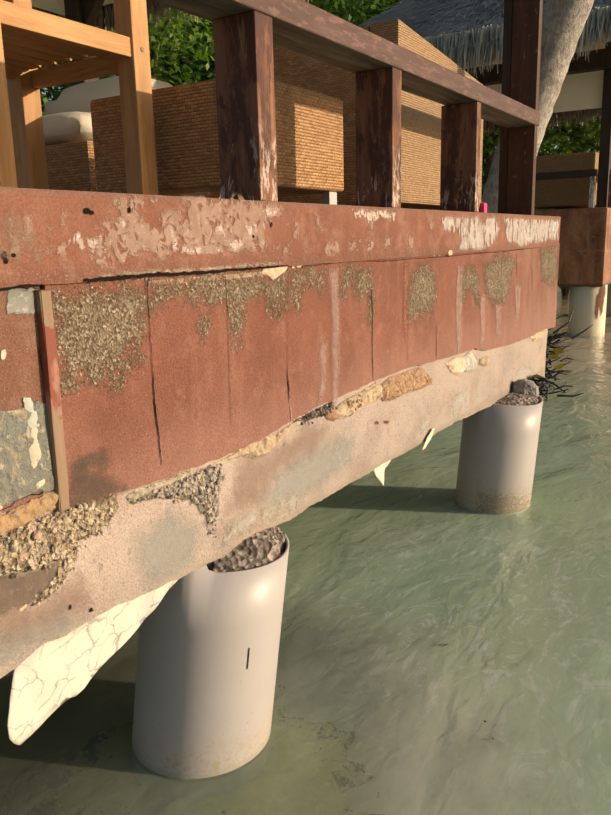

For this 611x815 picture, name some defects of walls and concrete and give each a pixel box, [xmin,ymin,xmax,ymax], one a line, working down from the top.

peeling [0,196,282,266]
crack [372,247,542,294]
crack [84,262,340,466]
spalling [294,367,432,425]
crack [367,292,375,365]
spalling [446,351,490,376]
spalling [0,397,119,614]
spalling [132,463,224,538]